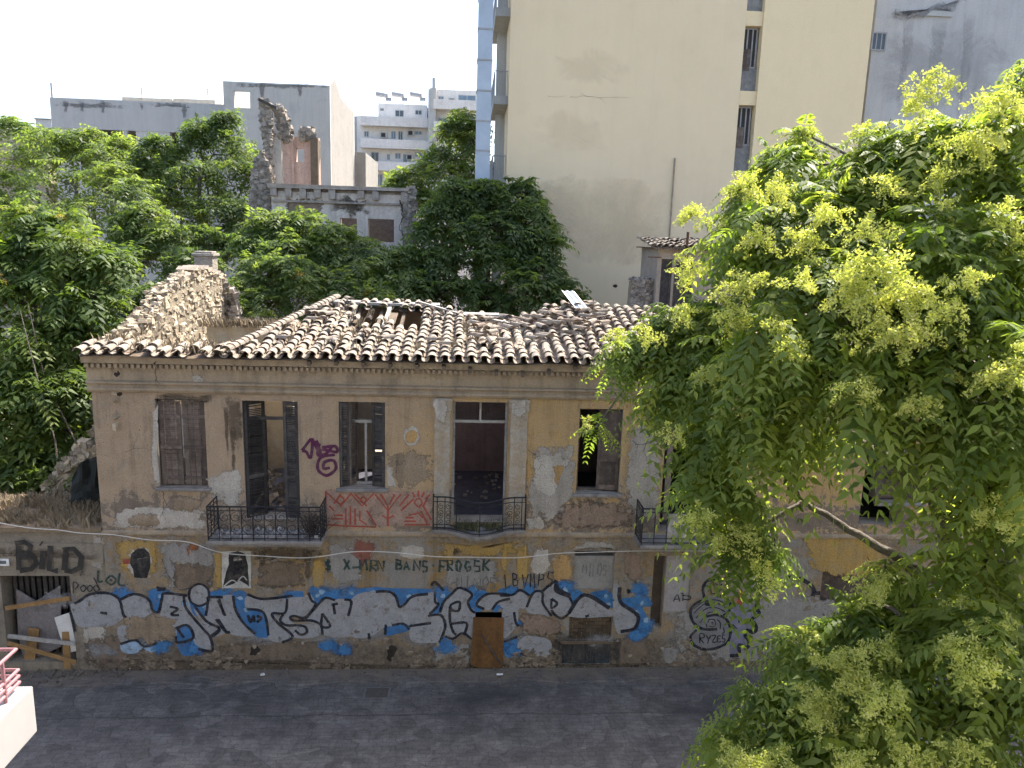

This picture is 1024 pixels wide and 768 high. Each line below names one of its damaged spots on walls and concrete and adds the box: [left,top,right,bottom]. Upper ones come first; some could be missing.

damp [897,0,958,19]
damp [63,102,108,112]
damp [224,401,242,469]
flaking render [386,465,396,488]
flaking render [515,426,661,582]
flaking render [91,469,242,579]
flaking render [172,553,222,591]